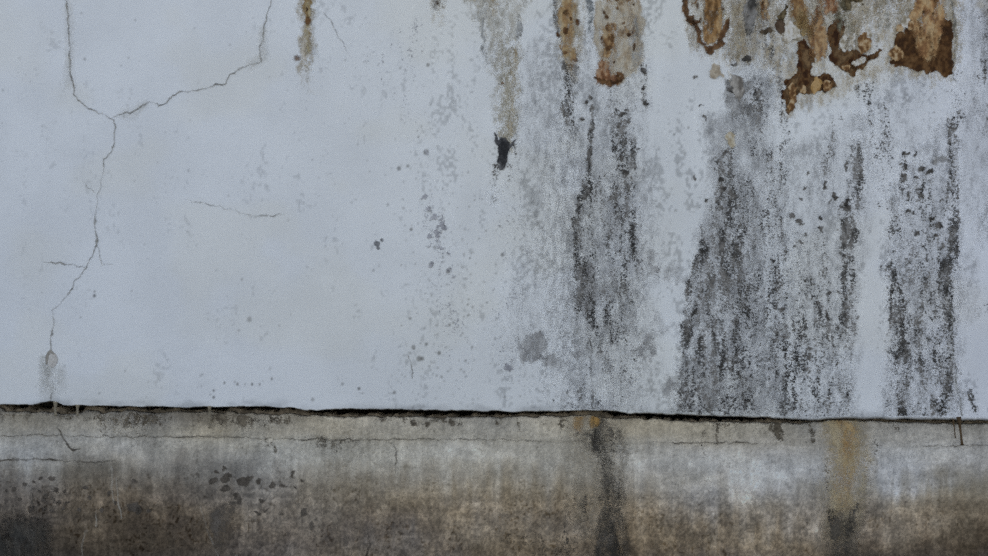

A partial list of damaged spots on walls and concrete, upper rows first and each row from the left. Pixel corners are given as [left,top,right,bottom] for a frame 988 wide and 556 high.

crack [65,2,271,167]
corrosion [294,0,317,73]
corrosion [464,0,526,149]
corrosion [553,0,645,87]
corrosion [682,0,963,115]
leakage [490,132,519,186]
crack [50,216,102,346]
leakage [421,193,454,283]
leakage [499,60,671,556]
leakage [663,0,988,455]
leakage [191,413,291,428]
leakage [209,466,304,556]